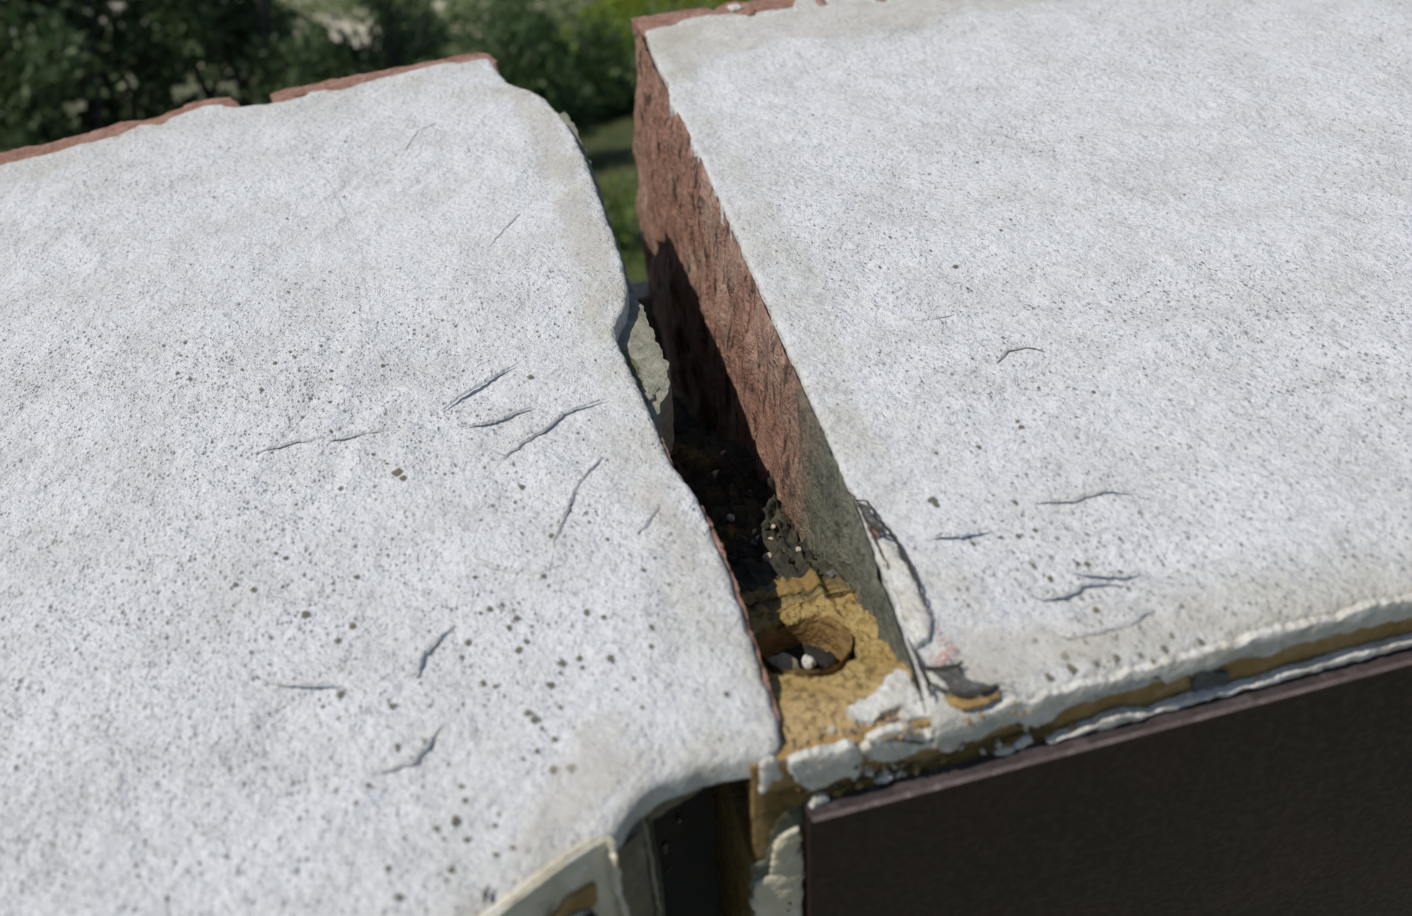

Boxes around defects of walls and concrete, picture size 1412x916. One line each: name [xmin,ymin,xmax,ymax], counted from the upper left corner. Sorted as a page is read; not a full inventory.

peeling [699,505,1412,916]
spalling [433,783,471,843]
spalling [645,787,702,823]
peeling [547,836,630,916]